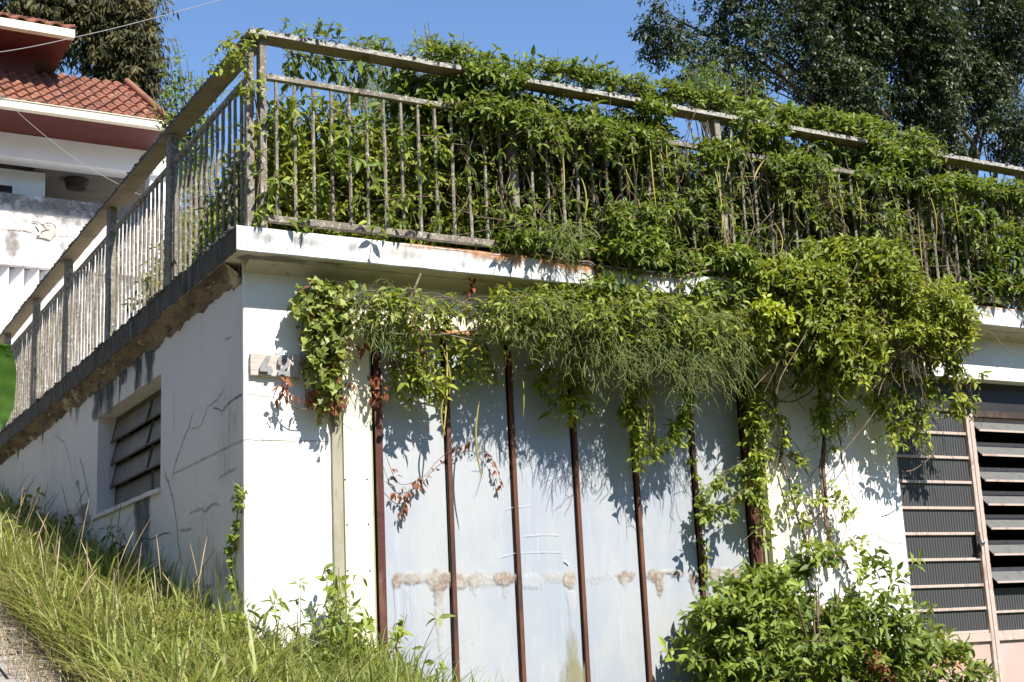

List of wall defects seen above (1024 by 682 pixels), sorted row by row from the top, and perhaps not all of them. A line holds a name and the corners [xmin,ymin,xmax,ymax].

rust [409,243,603,287]
water stain [92,350,155,419]
crack [142,388,271,564]
rust [567,639,586,682]